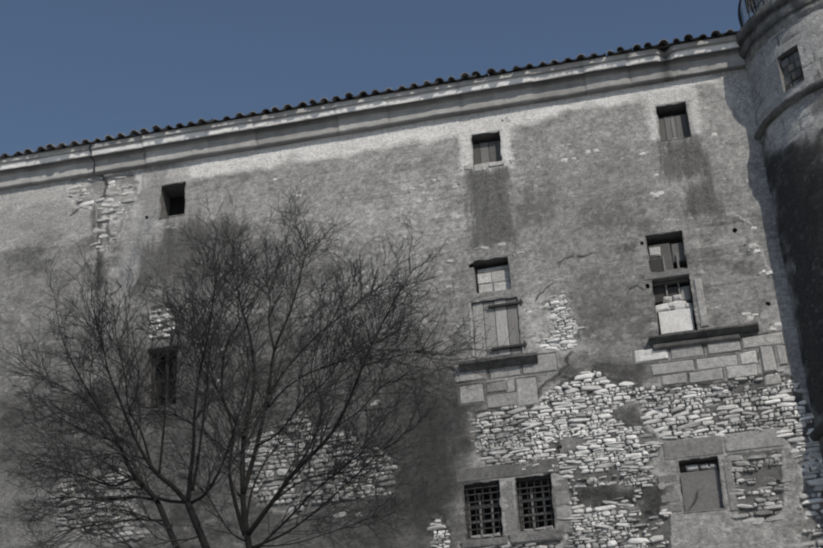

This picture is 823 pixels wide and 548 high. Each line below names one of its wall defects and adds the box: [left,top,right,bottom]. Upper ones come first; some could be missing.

crack [71,144,110,215]
spalling [65,174,140,253]
water stain [467,167,511,248]
water stain [764,128,823,415]
spalling [149,309,177,340]
spalling [534,294,585,350]
spalling [245,412,397,519]
spalling [467,368,823,548]
spalling [427,513,461,548]